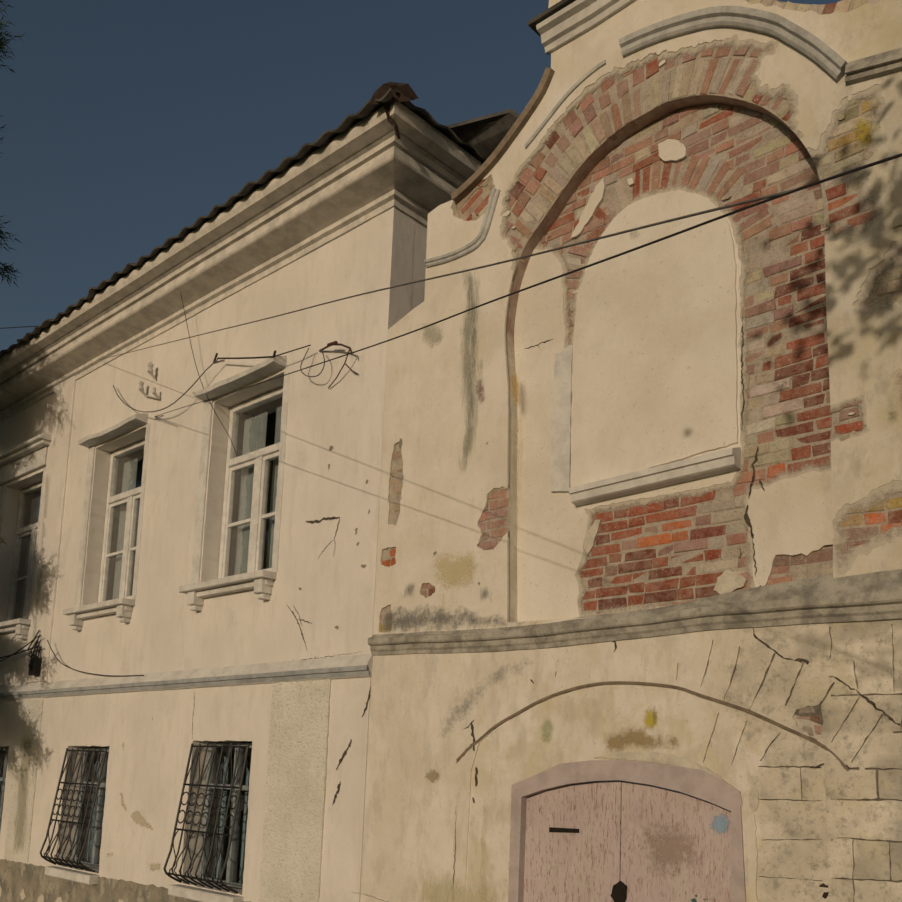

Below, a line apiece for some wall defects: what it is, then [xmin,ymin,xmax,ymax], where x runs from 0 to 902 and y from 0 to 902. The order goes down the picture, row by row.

flaking render [454,179,490,221]
flaking render [500,35,902,617]
leakage [464,277,477,454]
flaking render [390,439,404,512]
crack [306,517,340,559]
flaking render [382,547,396,567]
flaking render [478,490,509,550]
flaking render [421,583,435,598]
crack [753,628,809,665]
crack [828,676,899,725]
crack [332,739,352,805]
crack [447,720,477,902]